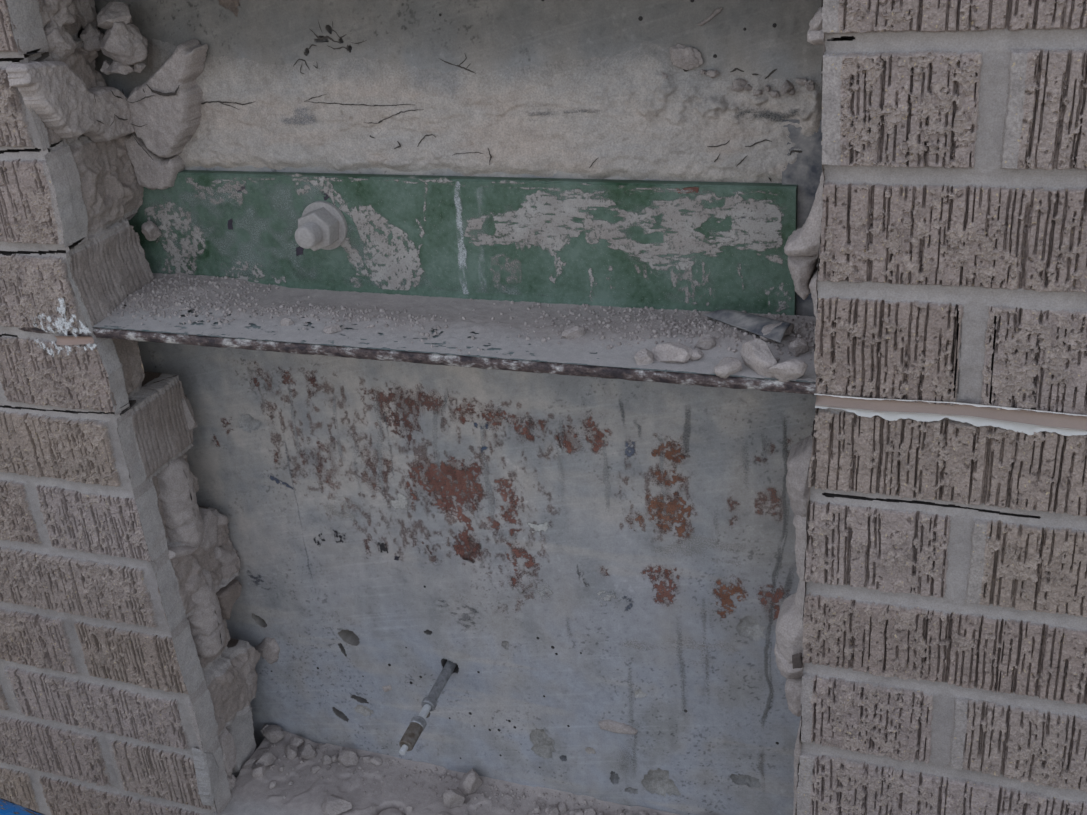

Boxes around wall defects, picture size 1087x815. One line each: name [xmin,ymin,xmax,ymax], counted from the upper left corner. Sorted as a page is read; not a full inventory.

crack [0,52,50,62]
spalling [6,39,208,190]
rust [250,362,611,612]
rust [620,435,696,544]
rust [755,488,782,518]
crack [824,493,1038,519]
rust [642,566,679,606]
rust [713,578,785,620]